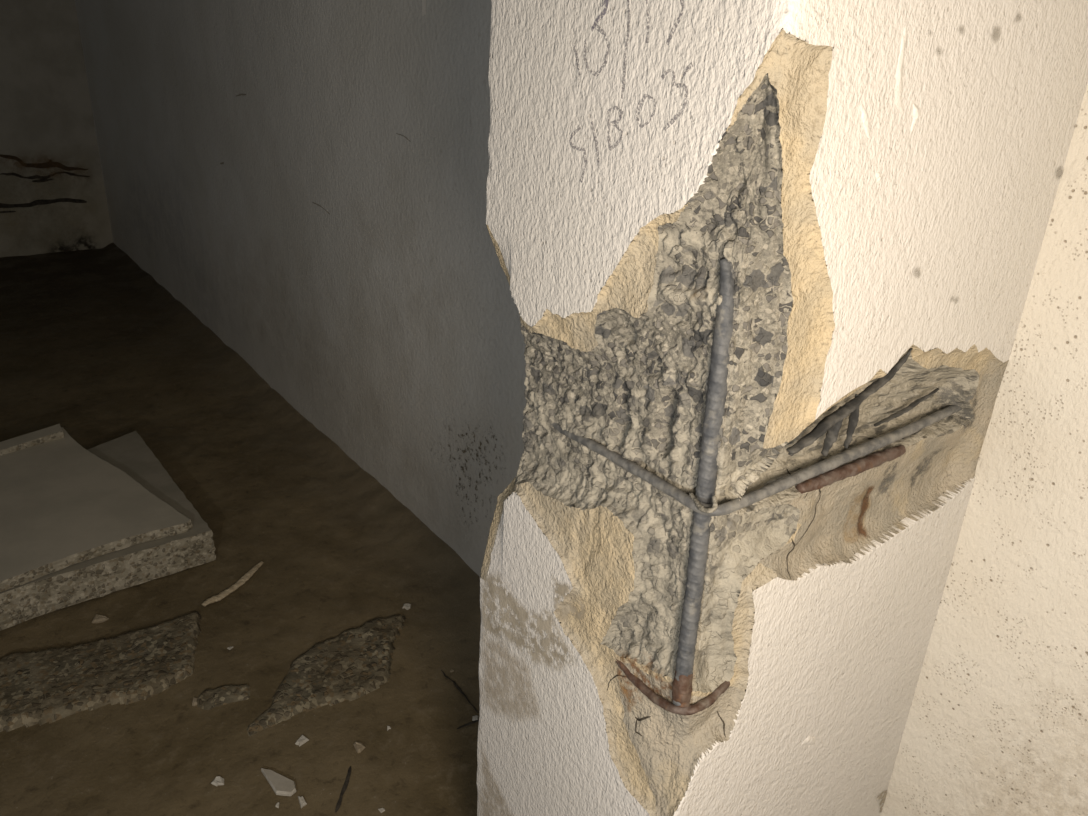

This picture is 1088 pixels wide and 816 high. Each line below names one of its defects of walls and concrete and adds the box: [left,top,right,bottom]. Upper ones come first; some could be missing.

crack [0,154,90,213]
spalling [480,29,1009,816]
corrosion [795,444,906,494]
corrosion [858,488,873,536]
corrosion [616,654,730,716]